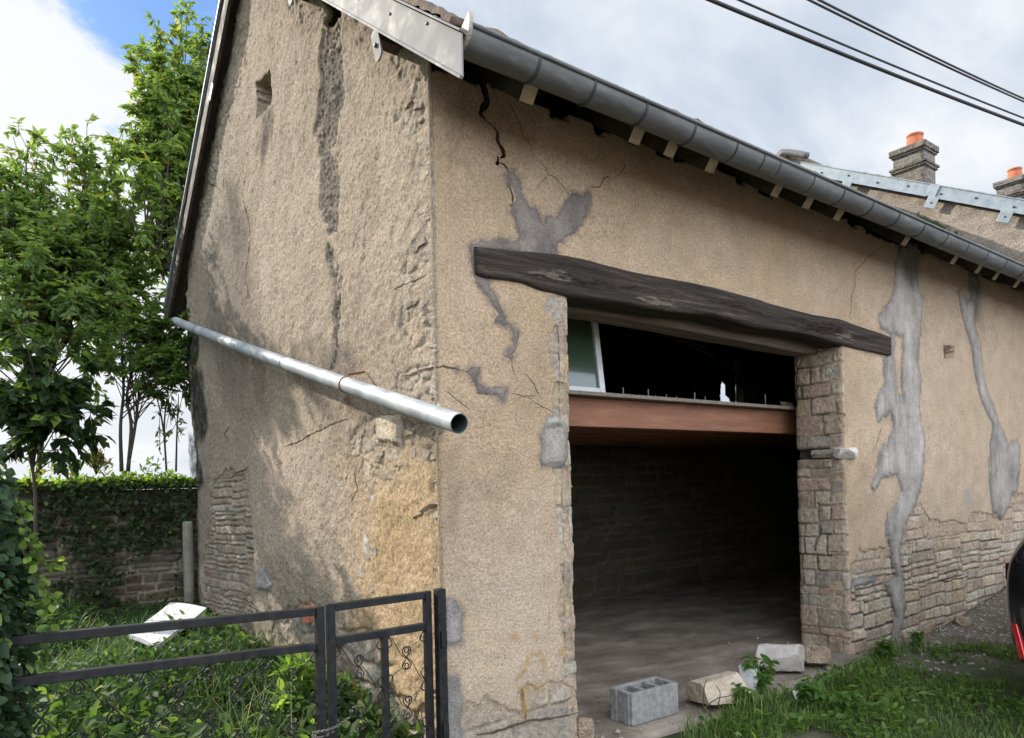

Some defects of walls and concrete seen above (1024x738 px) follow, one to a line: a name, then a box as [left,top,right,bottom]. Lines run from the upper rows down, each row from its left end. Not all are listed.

crack [475,83,625,205]
crack [276,419,347,465]
flaking render [202,469,257,616]
flaking render [460,295,595,738]
flaking render [842,493,1024,655]